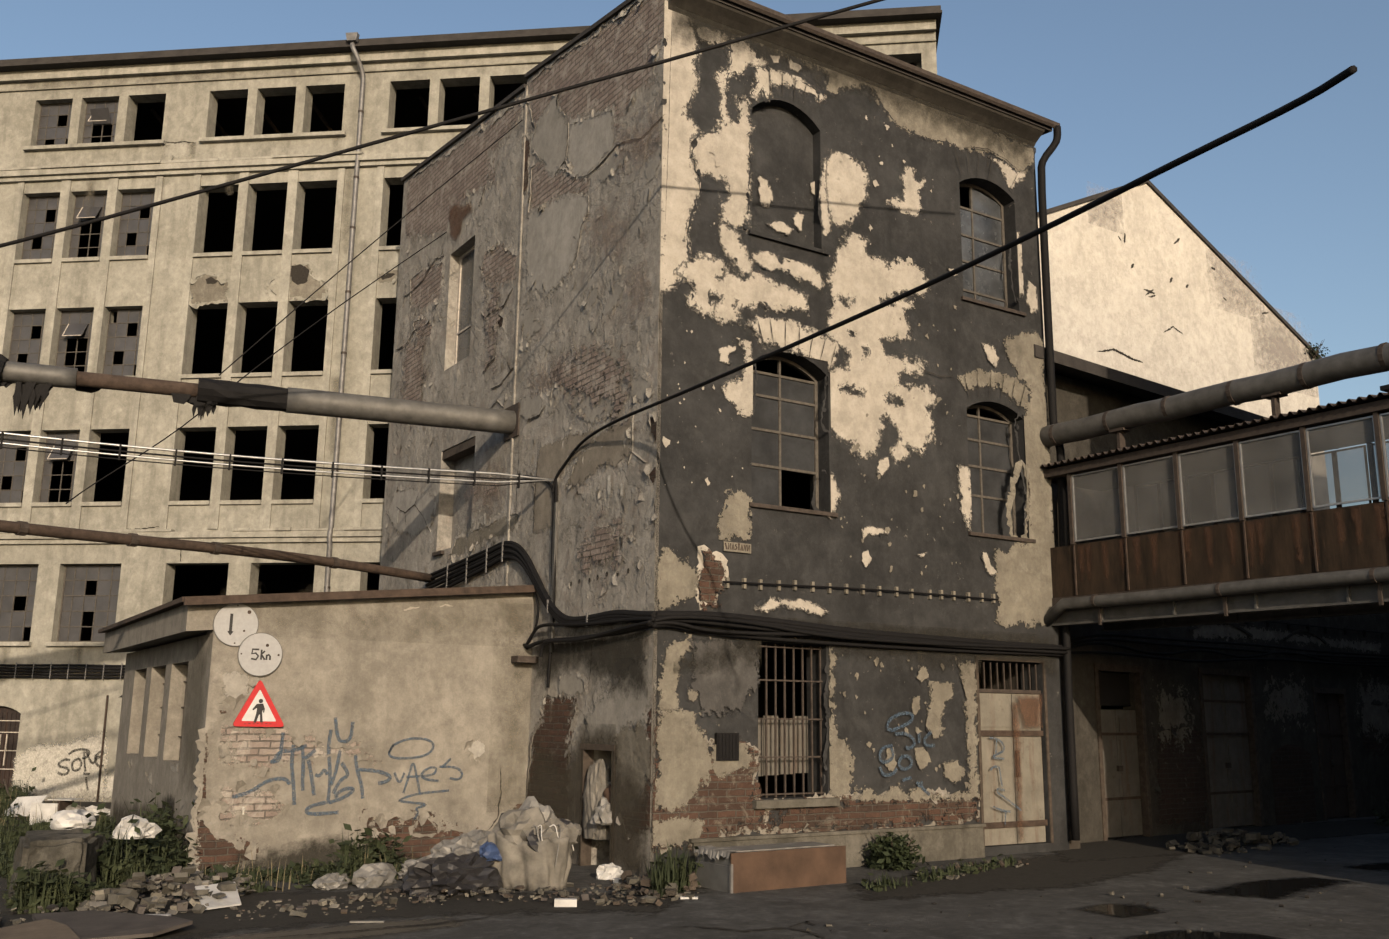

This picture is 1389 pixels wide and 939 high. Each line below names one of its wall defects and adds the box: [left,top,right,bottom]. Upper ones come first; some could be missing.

crack [554,30,672,274]
peeling [189,271,230,309]
peeling [263,262,329,303]
crack [397,496,431,532]
flaking render [170,665,382,871]
peeling [461,737,489,766]
flaking render [347,806,492,859]